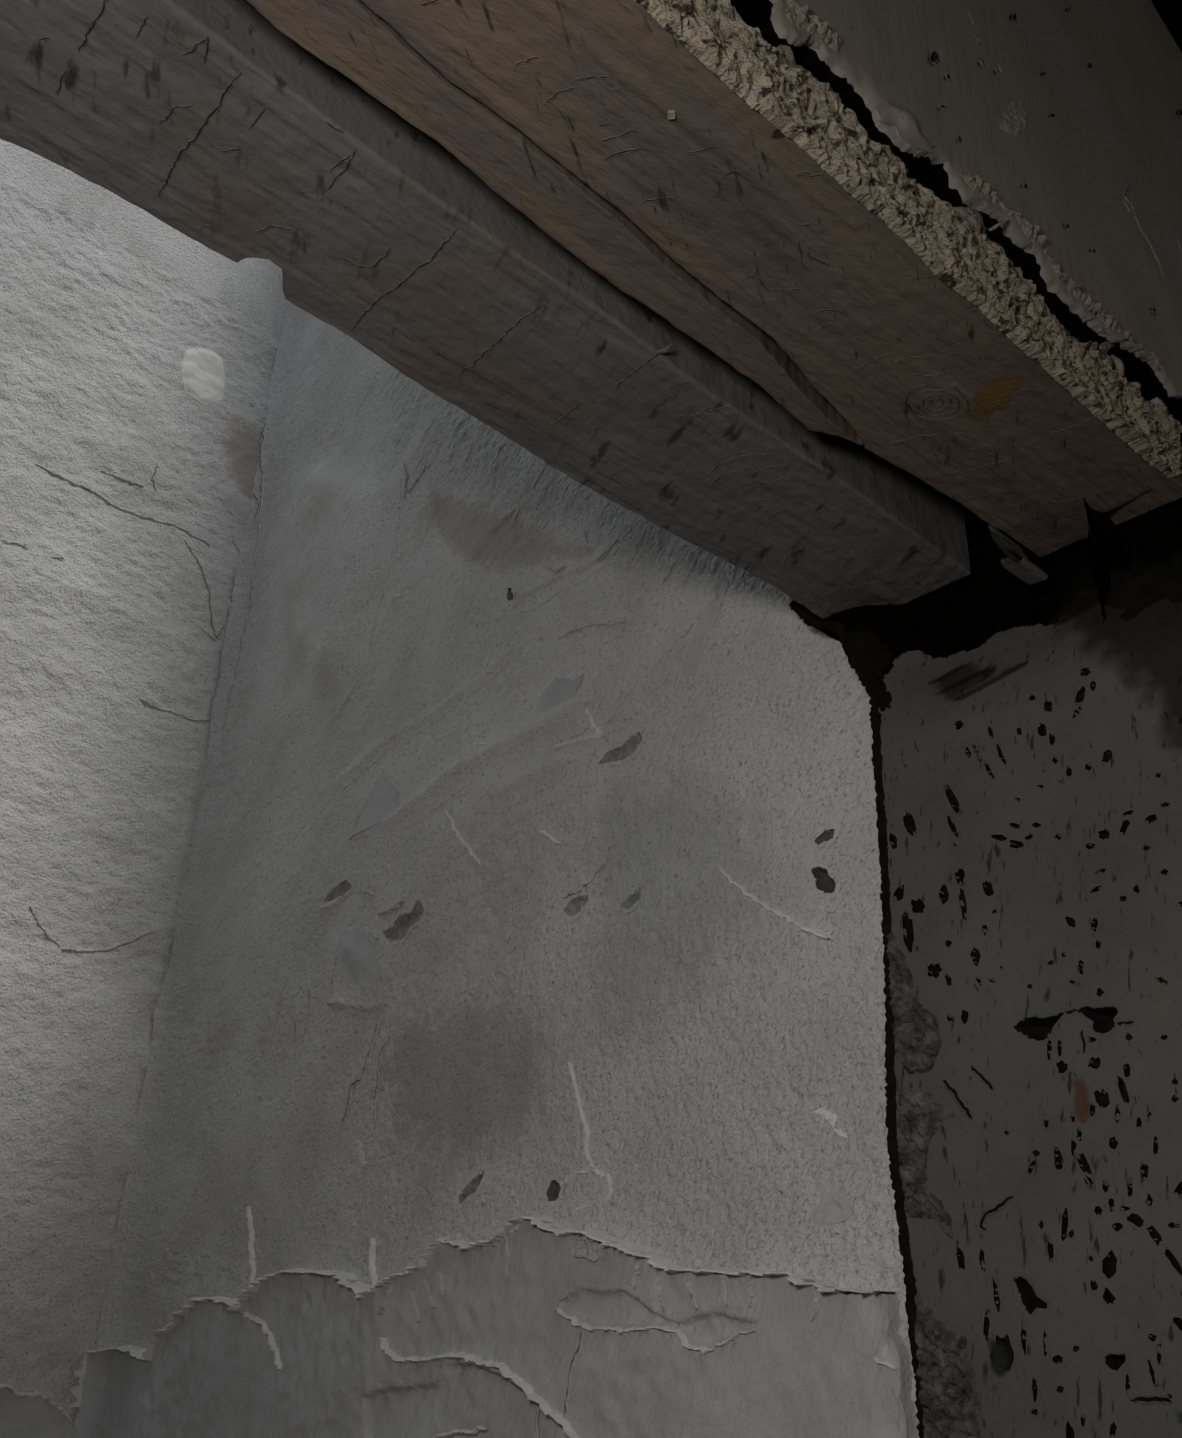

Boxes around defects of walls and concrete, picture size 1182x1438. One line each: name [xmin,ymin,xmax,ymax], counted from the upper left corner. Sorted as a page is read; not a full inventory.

crack [776,45,805,70]
crack [953,206,1008,234]
flaking render [959,171,1162,373]
crack [1123,186,1182,277]
crack [1099,341,1165,405]
crack [1083,498,1133,572]
spalling [1082,802,1172,895]
spalling [1047,913,1109,1001]
crack [339,1014,392,1168]
peeling [70,781,1081,1438]
spalling [1025,1029,1182,1309]
spalling [1122,1313,1182,1406]